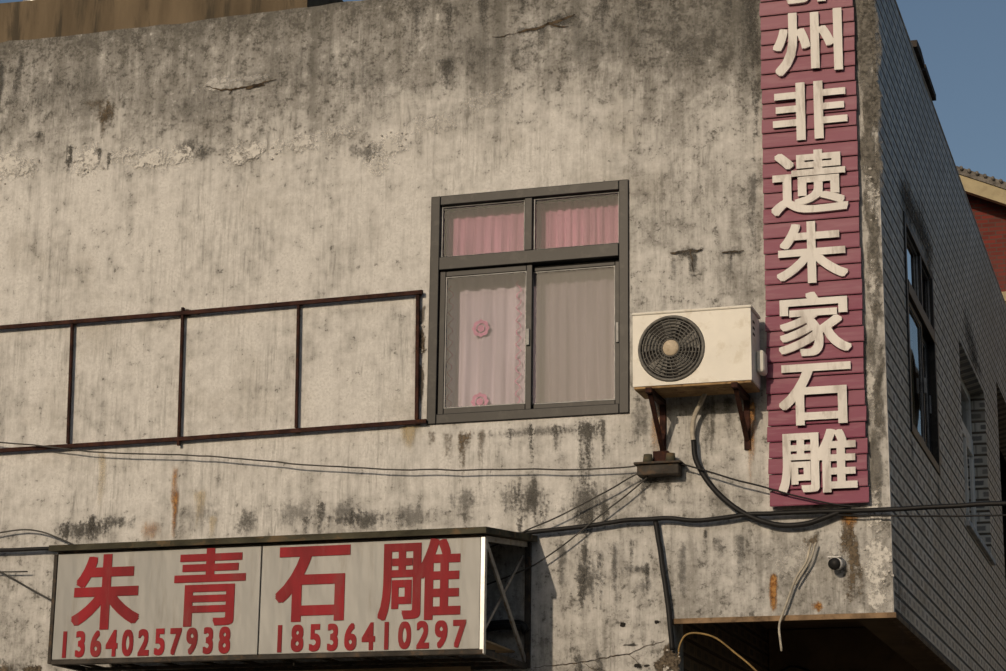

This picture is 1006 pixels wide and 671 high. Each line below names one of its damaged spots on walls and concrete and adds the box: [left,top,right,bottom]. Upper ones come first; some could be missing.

peeling [206,75,259,91]
peeling [0,149,40,185]
peeling [67,142,195,175]
water stain [458,432,483,467]
water stain [59,515,124,540]
water stain [515,477,549,531]
water stain [572,418,649,607]
rust [769,575,777,610]